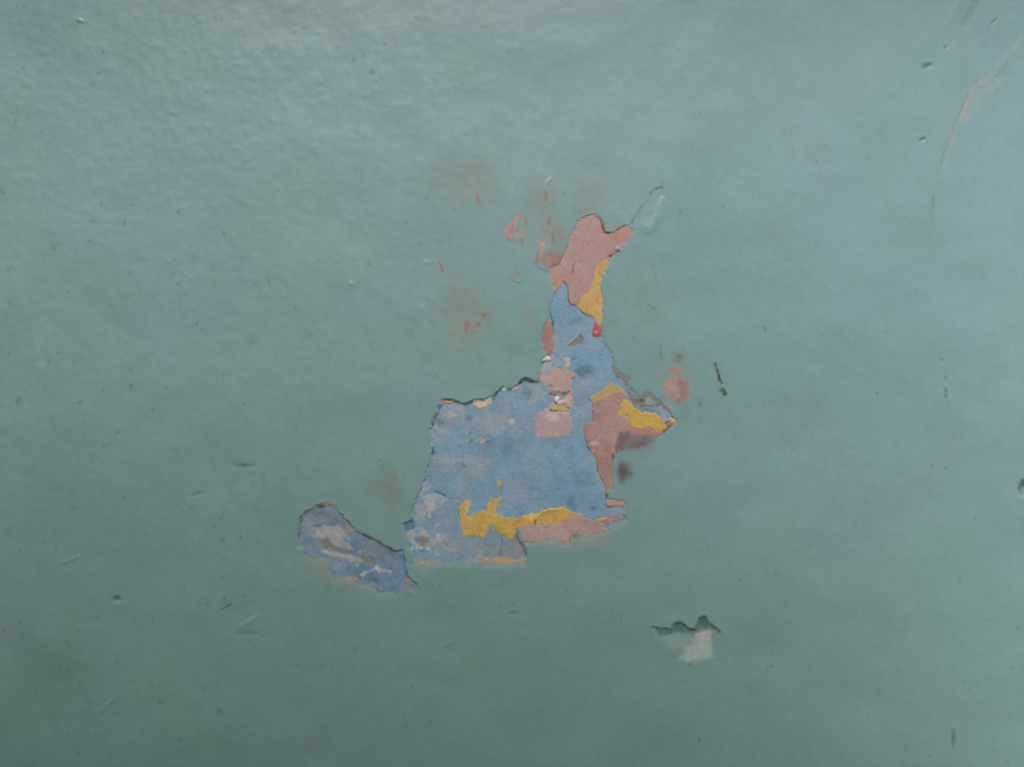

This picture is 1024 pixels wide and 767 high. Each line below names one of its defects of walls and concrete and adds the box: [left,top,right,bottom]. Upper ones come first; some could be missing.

peeling [297,214,707,600]